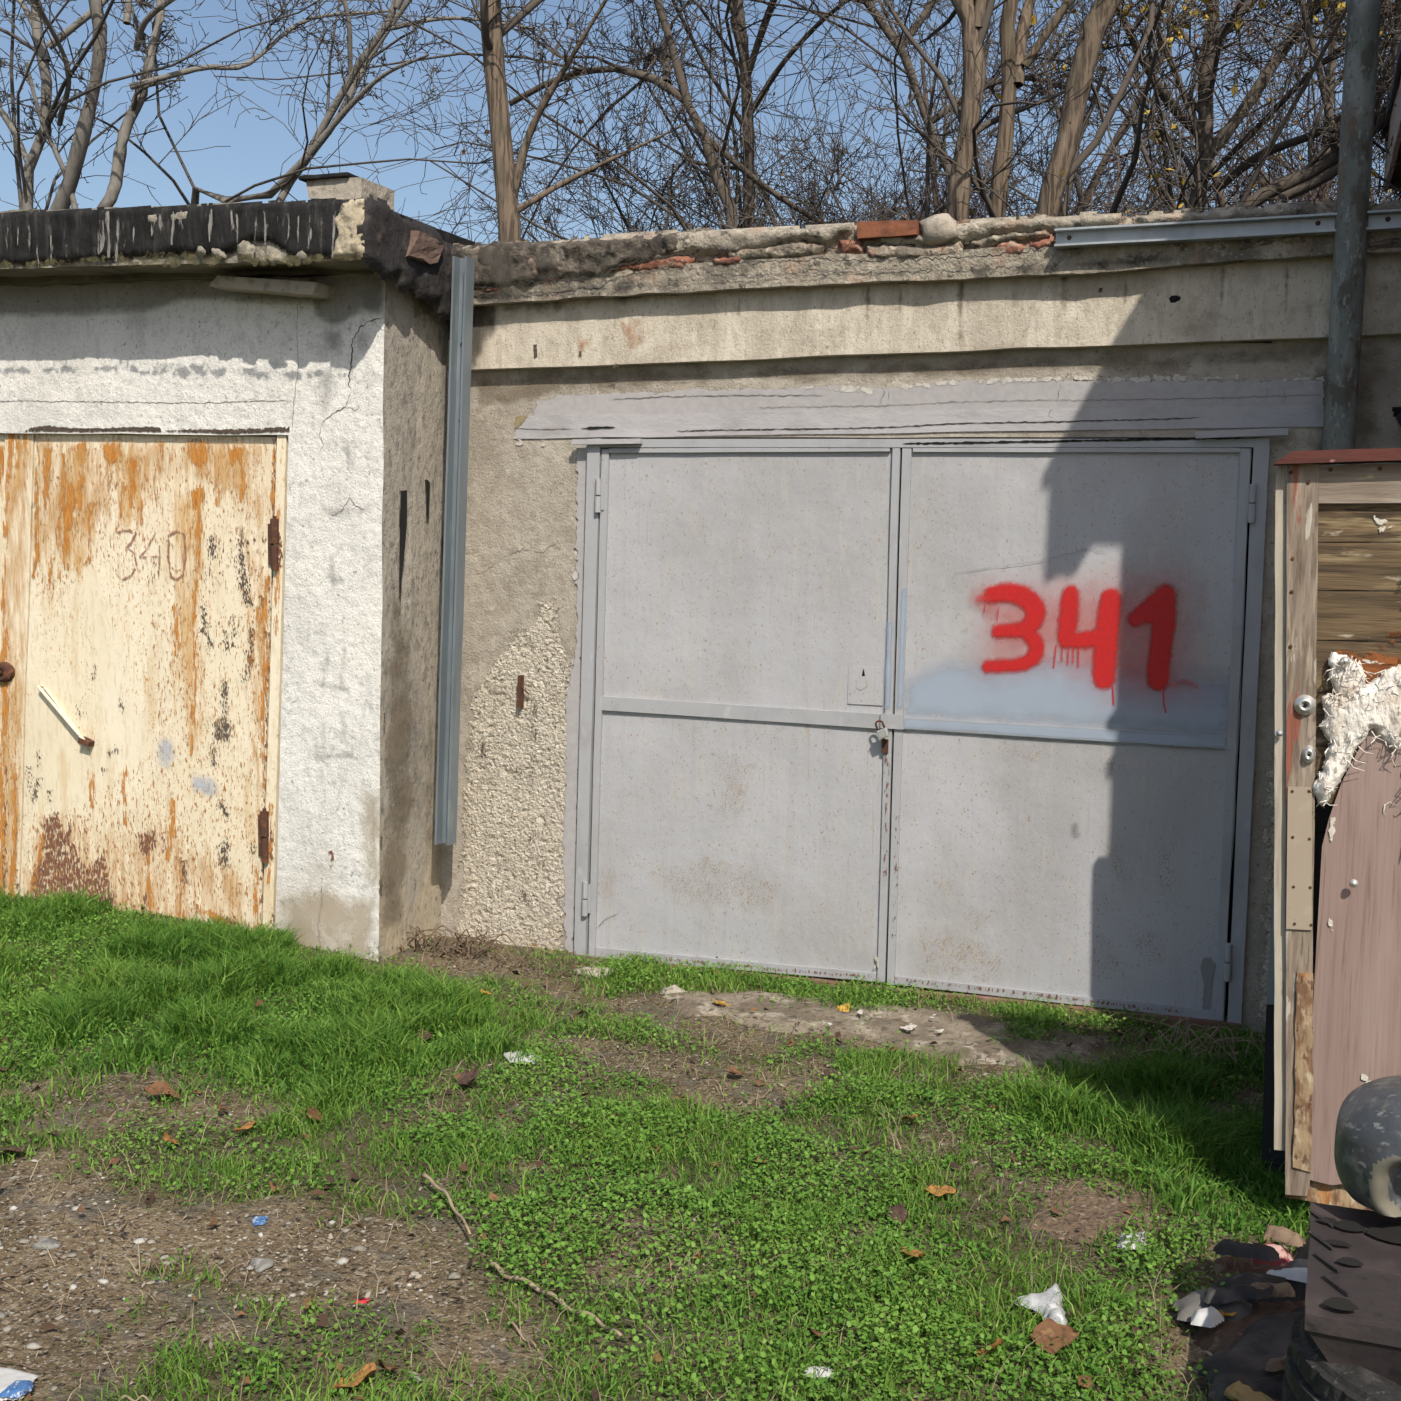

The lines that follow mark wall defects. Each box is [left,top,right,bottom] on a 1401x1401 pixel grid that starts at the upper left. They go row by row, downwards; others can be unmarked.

spalling [331,199,365,260]
spalling [610,228,1056,273]
crack [0,299,381,450]
rust [0,433,285,936]
spalling [454,593,575,951]